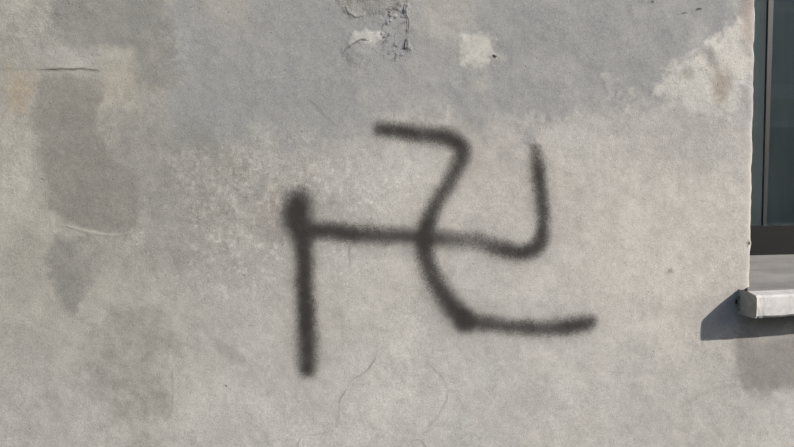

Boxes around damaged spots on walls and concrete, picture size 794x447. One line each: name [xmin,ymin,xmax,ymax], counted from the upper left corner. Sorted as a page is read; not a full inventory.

flaking render [335,0,418,64]
leakage [30,0,740,320]
leakage [64,285,185,447]
crack [297,354,377,447]
leakage [679,313,794,409]